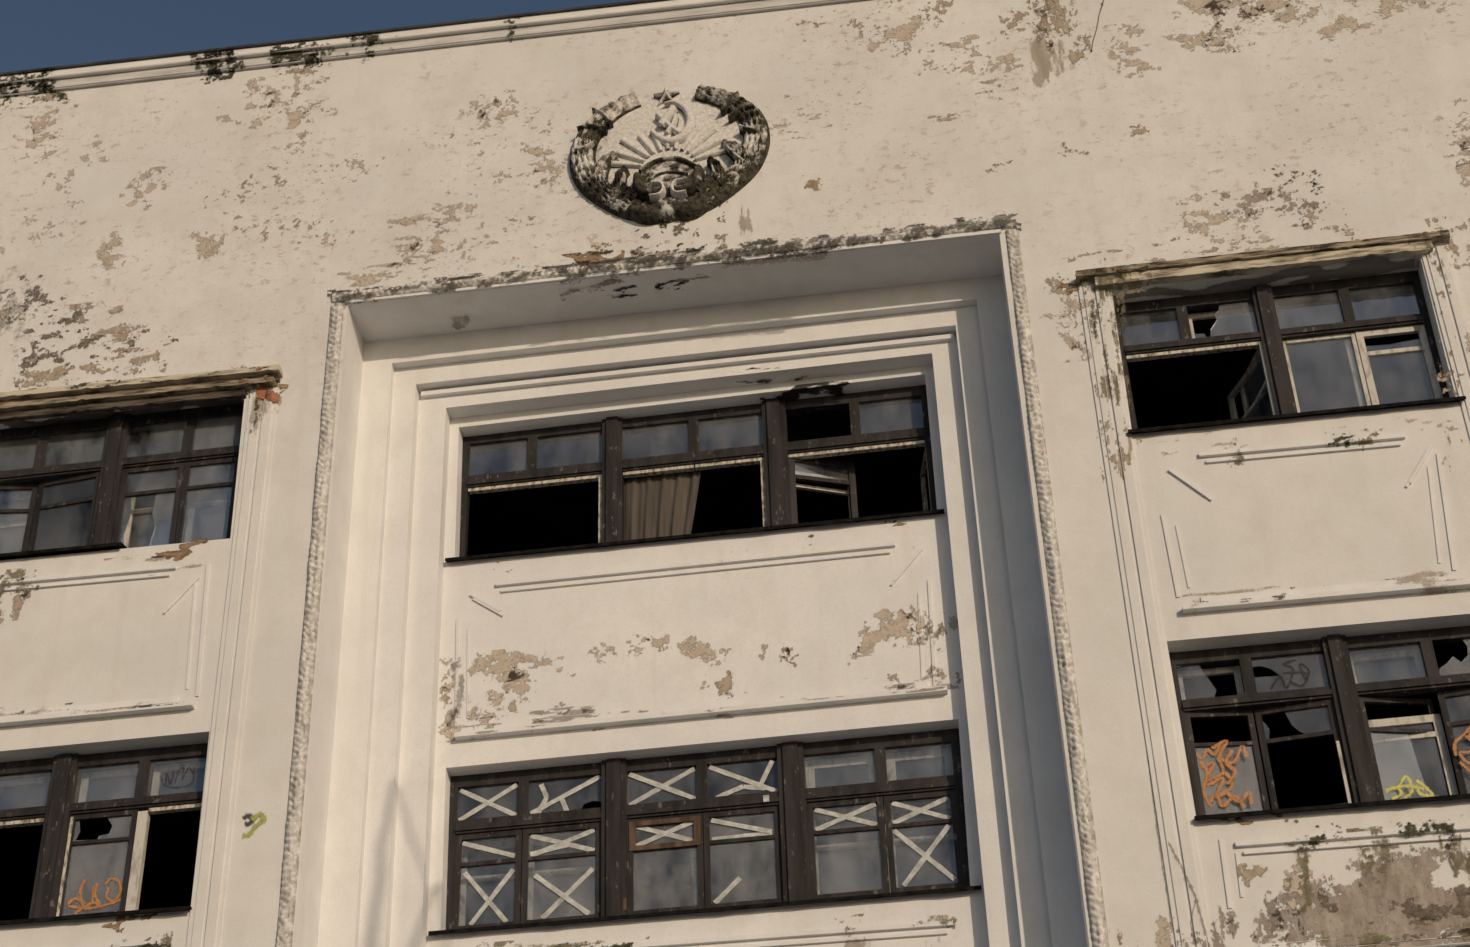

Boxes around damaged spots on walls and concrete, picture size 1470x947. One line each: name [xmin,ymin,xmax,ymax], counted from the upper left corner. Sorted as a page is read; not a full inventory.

peeling [796,0,1032,100]
peeling [1078,0,1449,78]
peeling [0,92,117,241]
peeling [187,63,368,259]
peeling [337,90,580,287]
peeling [1150,164,1359,262]
peeling [1436,99,1470,194]
peeling [5,275,179,389]
peeling [438,649,575,743]
peeling [589,634,746,699]
peeling [847,604,961,684]
peeling [1155,844,1470,947]